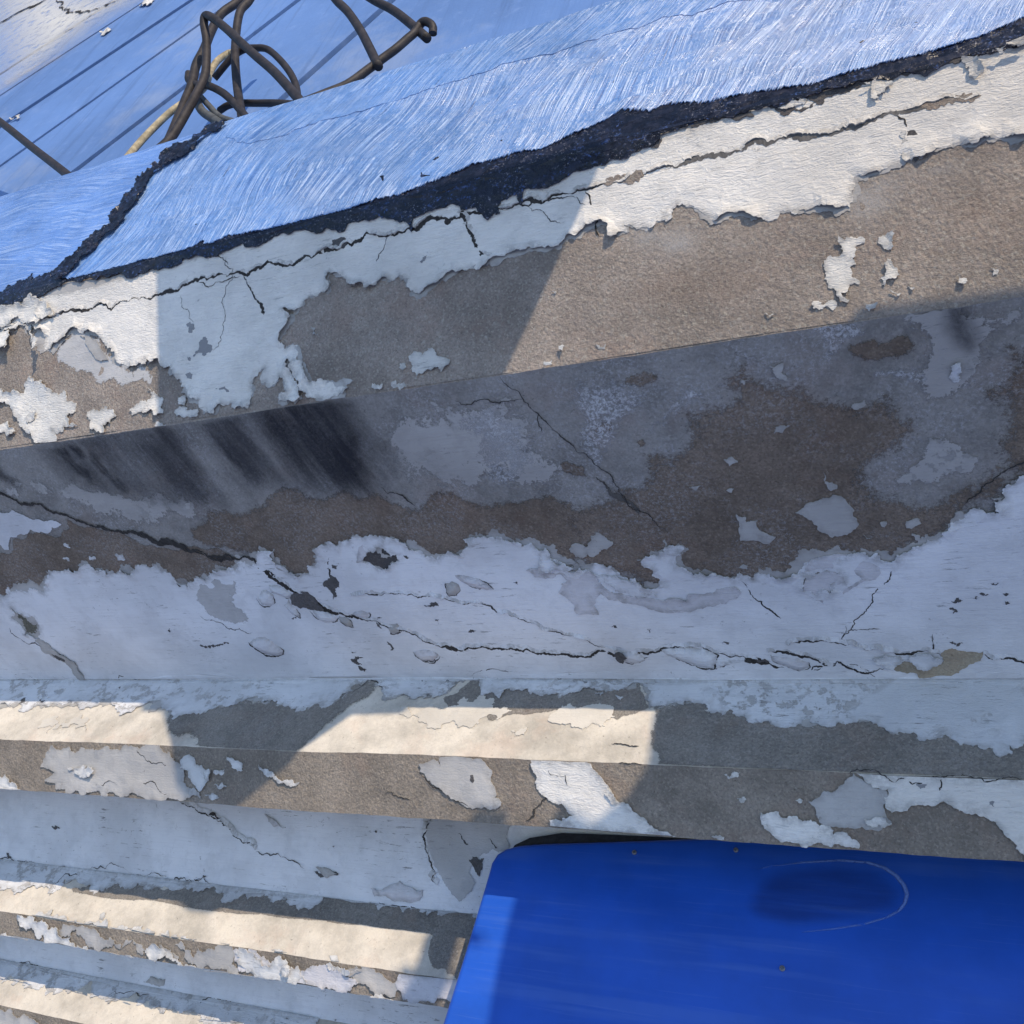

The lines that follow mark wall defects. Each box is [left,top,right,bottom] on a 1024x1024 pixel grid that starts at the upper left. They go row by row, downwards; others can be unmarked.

spalling [770,72,911,116]
crack [0,92,981,346]
damp [270,404,357,481]
peeling [0,130,1024,624]
crack [456,377,668,533]
peeling [18,614,85,680]
peeling [37,652,376,801]
crack [0,492,941,679]
peeling [399,679,1024,855]
spalling [872,641,983,678]
crack [983,650,1024,664]
peeling [0,818,511,1003]